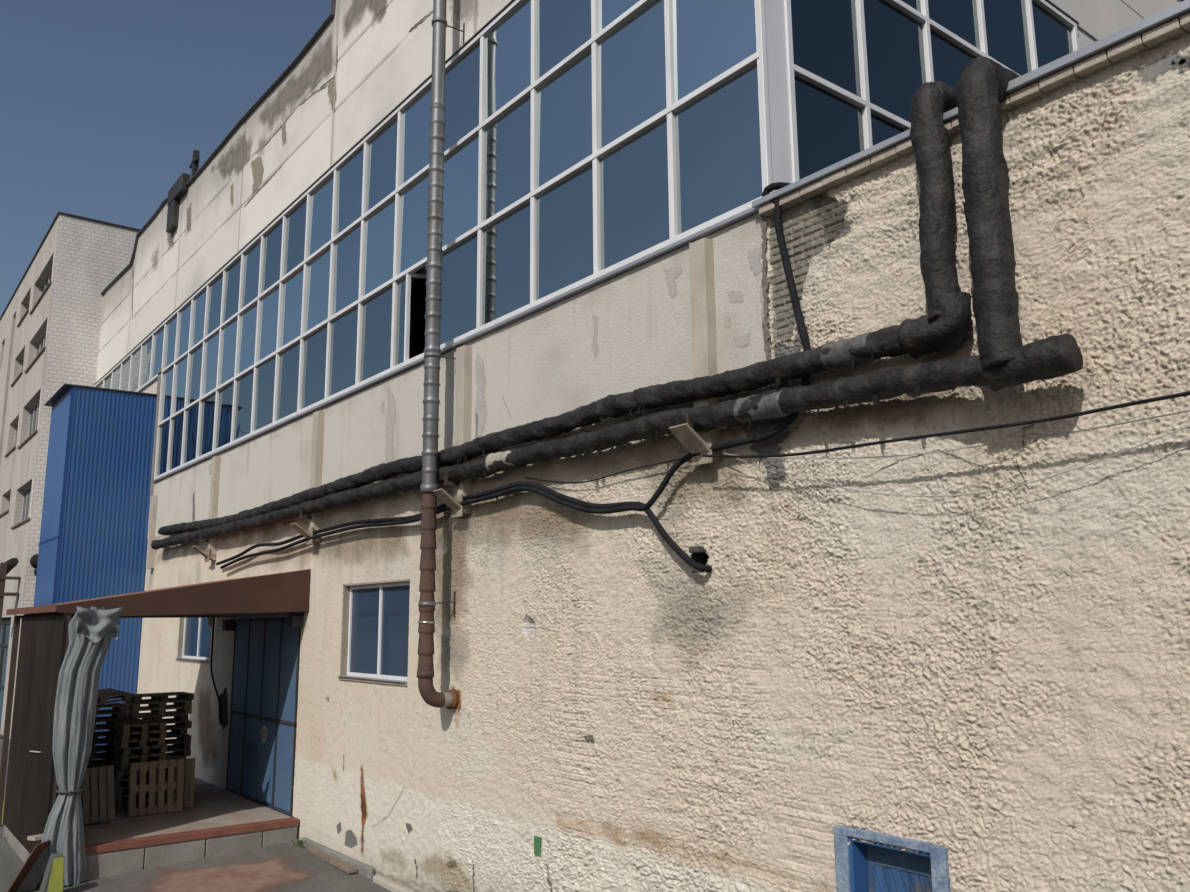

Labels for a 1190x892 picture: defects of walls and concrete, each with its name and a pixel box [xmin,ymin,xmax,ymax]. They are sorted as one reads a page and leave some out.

water stain [345,0,387,33]
water stain [453,0,473,19]
peeling [1136,53,1190,83]
water stain [261,37,336,143]
water stain [219,137,263,177]
water stain [153,207,191,265]
spalling [748,192,851,358]